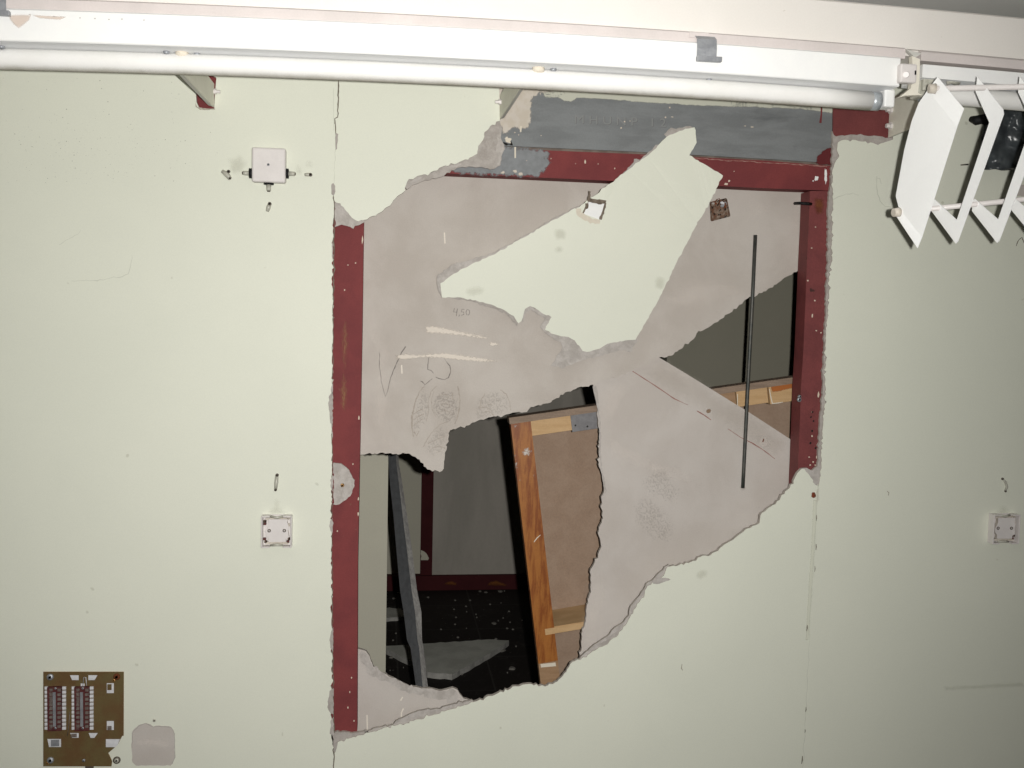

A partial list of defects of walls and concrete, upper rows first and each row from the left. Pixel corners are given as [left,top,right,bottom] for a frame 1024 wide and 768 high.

peeling [494,137,513,166]
crack [331,81,339,380]
crack [328,412,336,517]
spalling [593,386,607,500]
crack [330,543,338,768]
spalling [359,651,459,703]
crack [801,484,819,764]